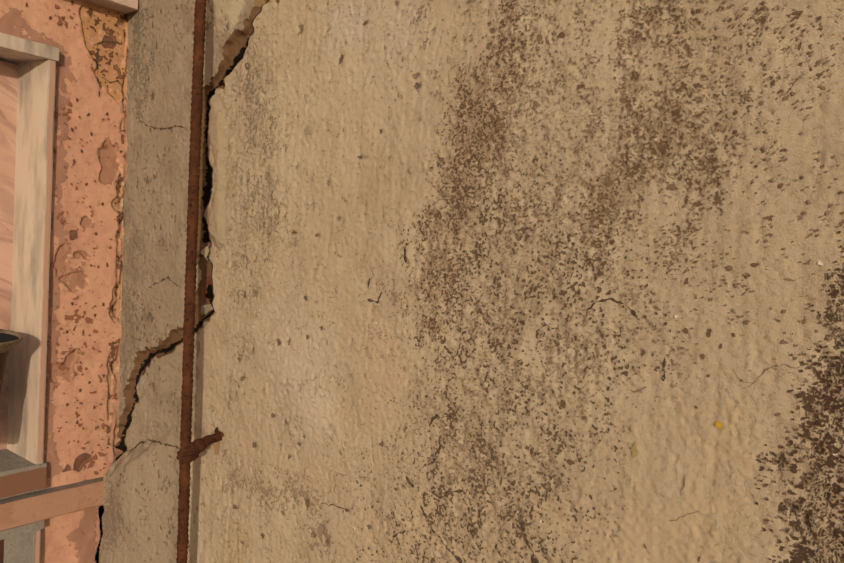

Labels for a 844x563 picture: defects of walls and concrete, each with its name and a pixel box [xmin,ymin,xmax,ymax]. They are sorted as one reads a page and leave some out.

peeling [46,0,128,481]
crack [115,0,269,466]
leakage [188,0,844,563]